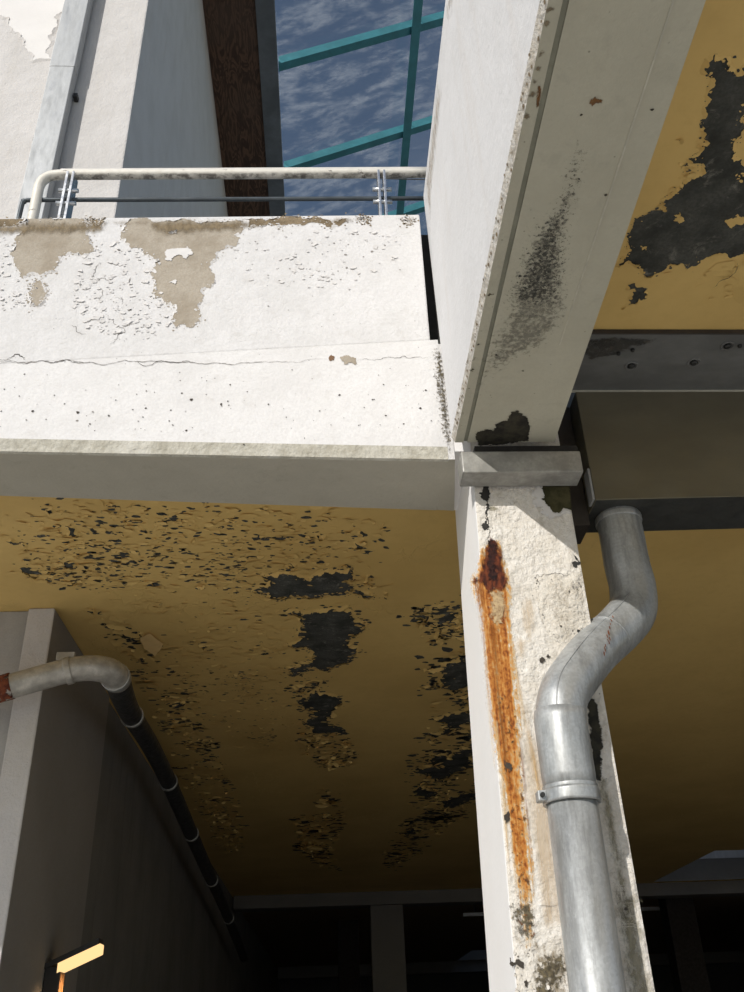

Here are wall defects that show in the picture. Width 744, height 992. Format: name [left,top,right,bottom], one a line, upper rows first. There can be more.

flaking render [0,0,65,63]
crack [0,263,308,366]
leakage [495,171,578,361]
peeling [615,53,744,309]
peeling [0,498,392,771]
peeling [382,595,476,871]
rust [471,539,535,948]
leakage [509,902,537,946]
leakage [533,951,566,992]